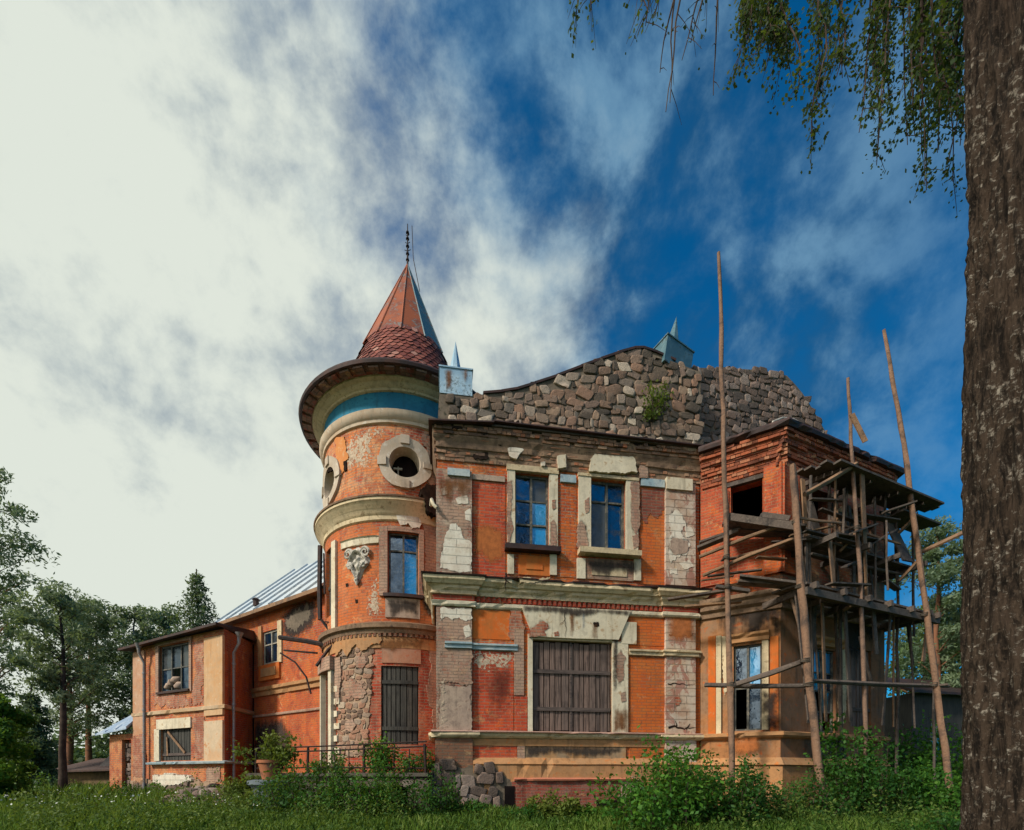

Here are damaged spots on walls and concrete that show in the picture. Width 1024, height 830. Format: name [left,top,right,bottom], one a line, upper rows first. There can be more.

peeling [327,424,383,475]
peeling [396,433,514,573]
peeling [540,454,567,472]
peeling [588,436,695,575]
peeling [334,633,382,707]
spalling [423,600,559,739]